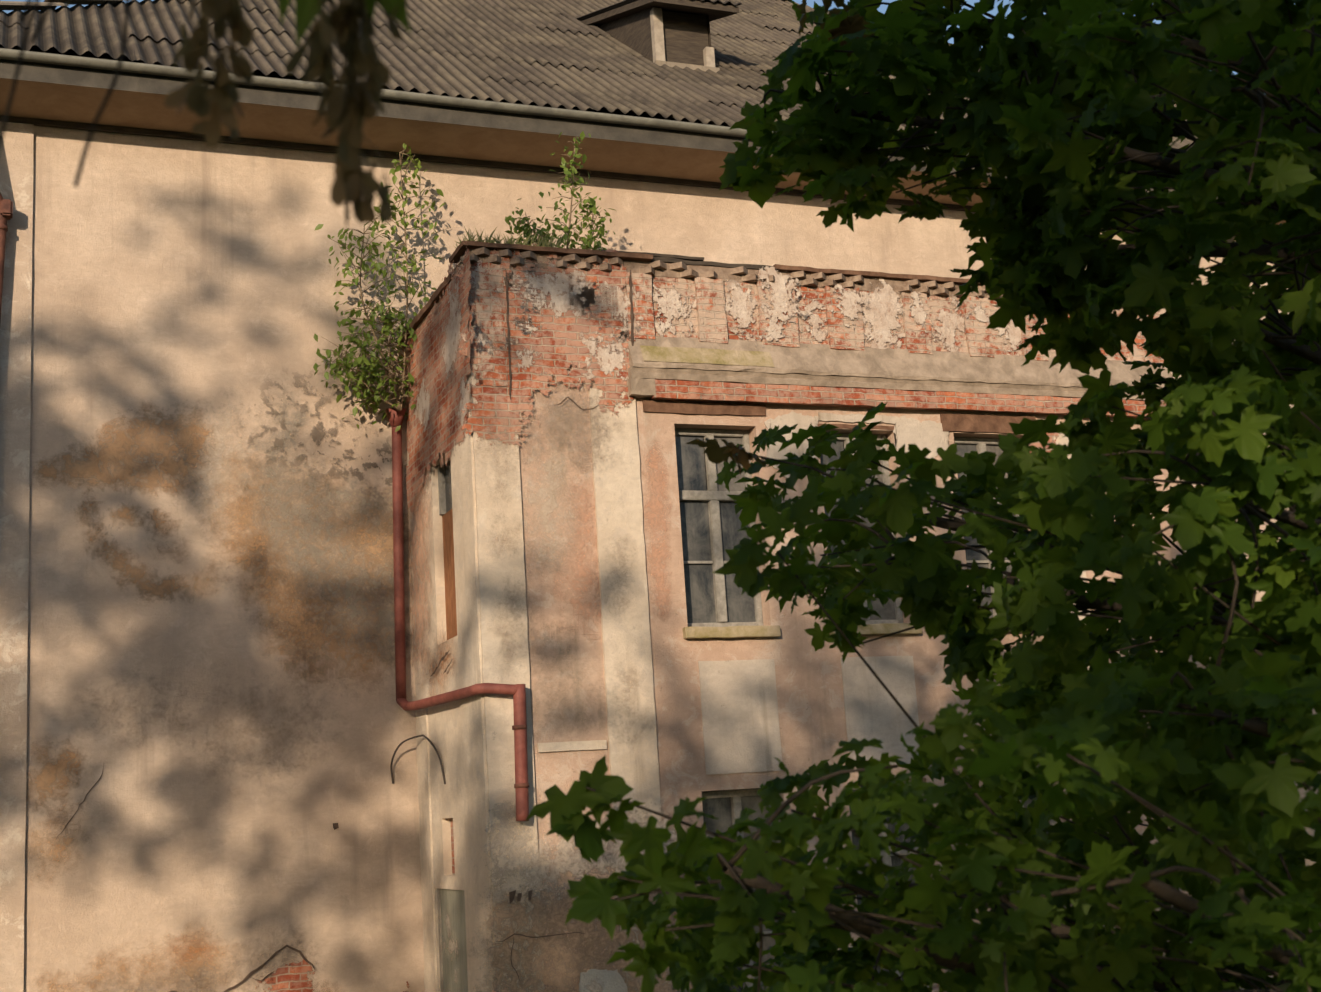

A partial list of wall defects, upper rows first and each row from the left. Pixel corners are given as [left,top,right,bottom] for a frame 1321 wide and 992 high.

flaking render [441,243,697,449]
flaking render [413,369,432,439]
spalling [224,945,317,992]